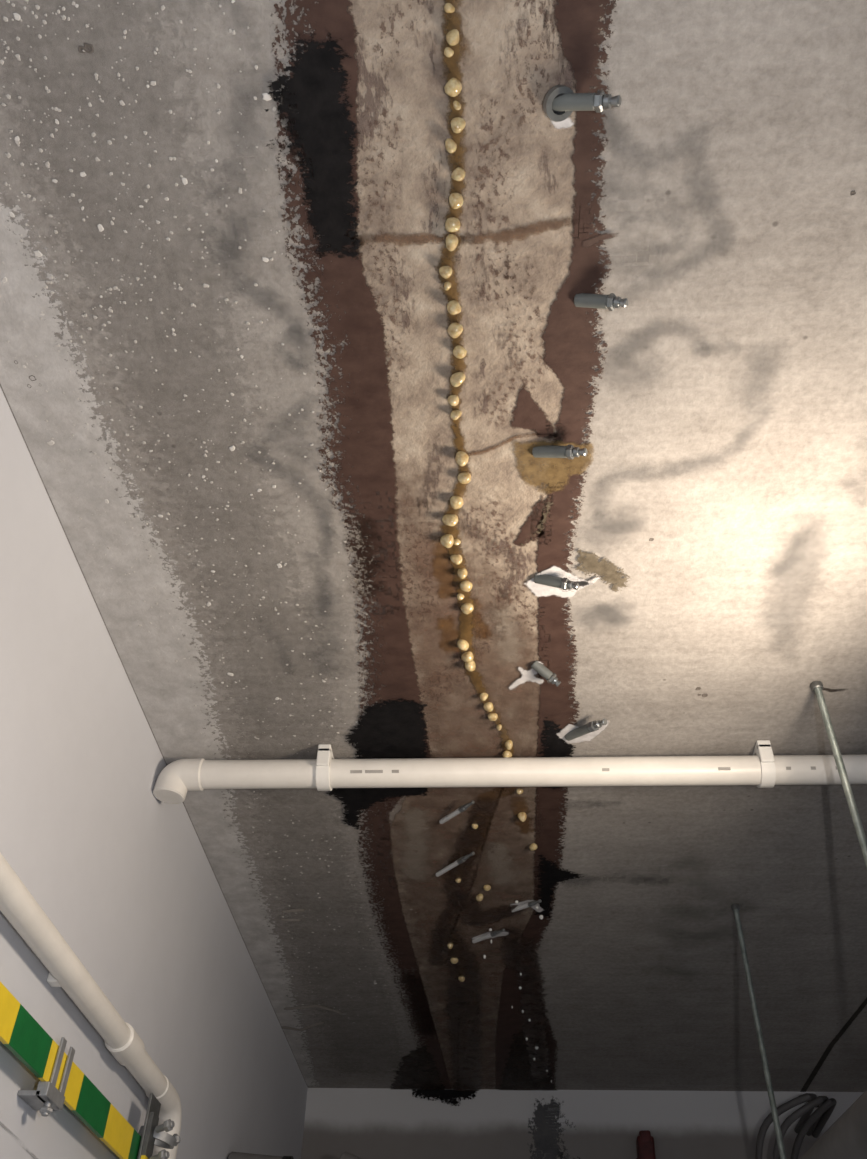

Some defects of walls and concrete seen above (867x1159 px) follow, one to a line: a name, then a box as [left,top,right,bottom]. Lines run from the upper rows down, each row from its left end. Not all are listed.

corrosion [347,219,573,246]
peeling [0,0,357,765]
spalling [348,0,597,758]
crack [433,0,554,758]
corrosion [514,441,593,545]
corrosion [574,550,629,592]
peeling [183,788,389,1087]
spalling [388,787,545,1089]
damp [428,801,552,1091]
crack [444,787,538,1039]
damp [528,1098,580,1159]